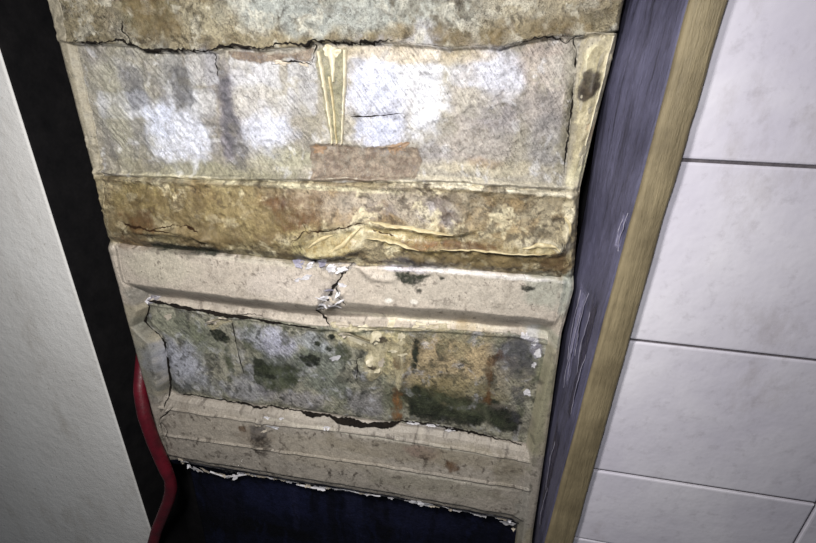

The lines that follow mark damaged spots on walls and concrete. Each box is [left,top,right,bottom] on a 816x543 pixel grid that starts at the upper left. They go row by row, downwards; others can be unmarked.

crack [71,22,392,76]
crack [122,221,199,235]
water stain [208,320,234,382]
water stain [253,334,351,392]
crack [144,260,521,451]
water stain [411,339,420,369]
water stain [408,386,519,433]
peeling [178,458,516,532]